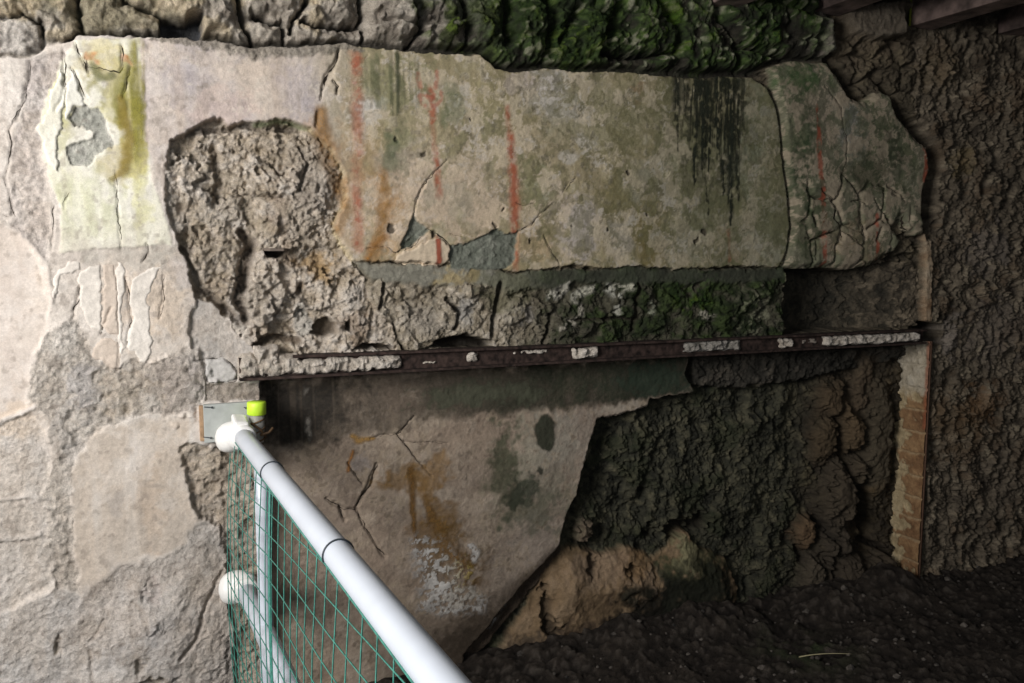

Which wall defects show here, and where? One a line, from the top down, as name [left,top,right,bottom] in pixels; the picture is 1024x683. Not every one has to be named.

damp [91,65,114,80]
damp [111,87,144,180]
damp [674,77,746,226]
crack [369,166,461,253]
crack [786,191,907,259]
spalling [28,119,921,592]
crack [327,465,384,554]
corrosion [404,466,479,598]
spalling [228,604,261,683]
damp [412,538,527,664]